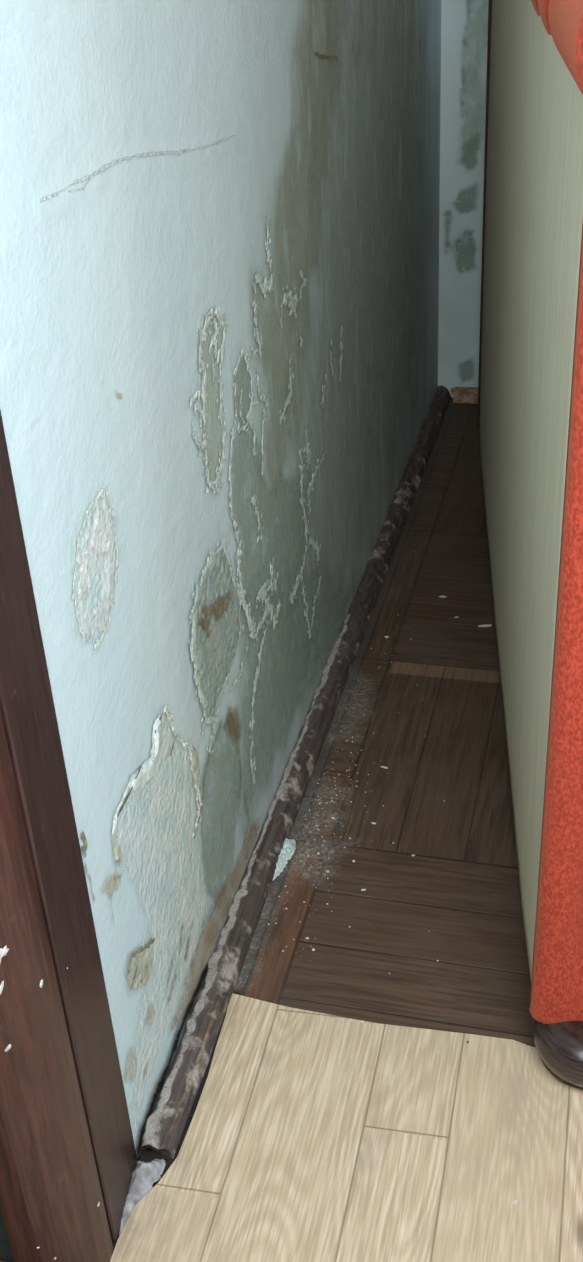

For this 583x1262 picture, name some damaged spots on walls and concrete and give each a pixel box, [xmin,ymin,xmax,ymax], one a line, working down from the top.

damp [446,188,475,271]
peeling [103,614,351,1140]